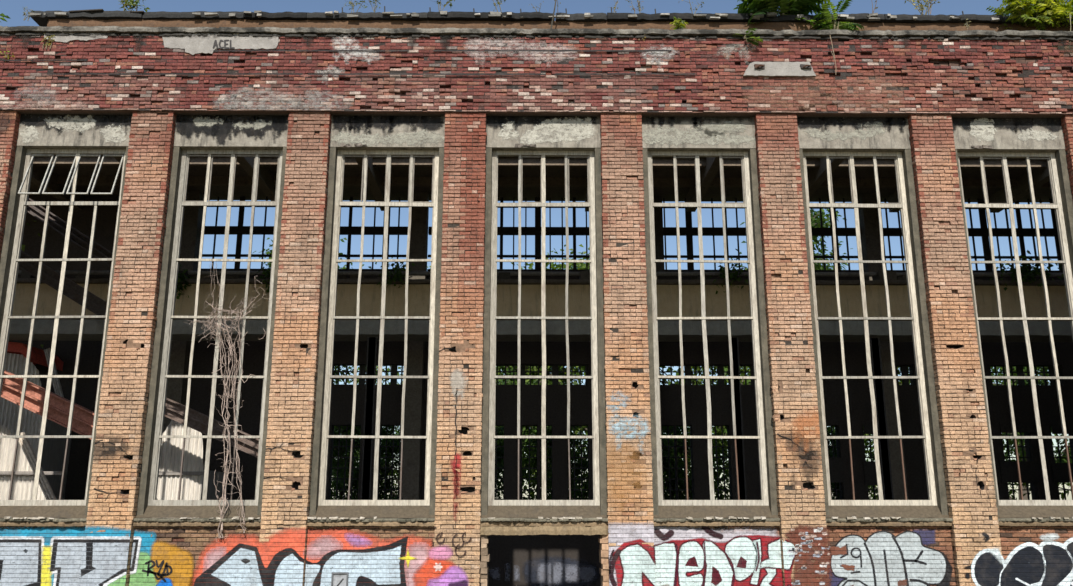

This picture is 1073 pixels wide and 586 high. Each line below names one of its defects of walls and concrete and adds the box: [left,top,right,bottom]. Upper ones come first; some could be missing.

flaking render [19,115,127,143]
flaking render [970,118,997,149]
flaking render [1018,128,1057,141]
peeling [785,516,901,586]